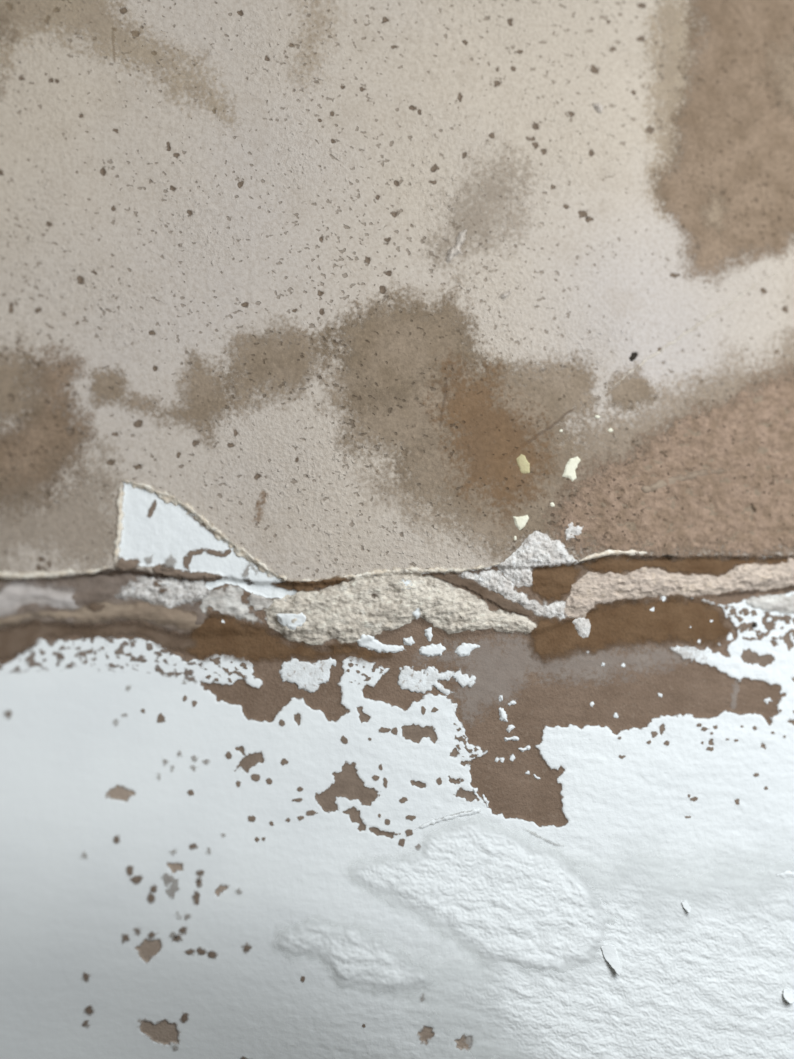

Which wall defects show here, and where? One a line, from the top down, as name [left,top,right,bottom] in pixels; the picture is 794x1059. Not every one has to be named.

water stain [656,0,794,277]
water stain [0,292,794,601]
crack [650,553,789,561]
peeling [0,363,794,827]
crack [718,585,794,596]
peeling [286,762,421,851]
peeling [127,850,183,903]
peeling [122,871,217,962]
peeling [140,1013,188,1050]
peeling [418,1026,435,1045]
peeling [455,1035,473,1050]